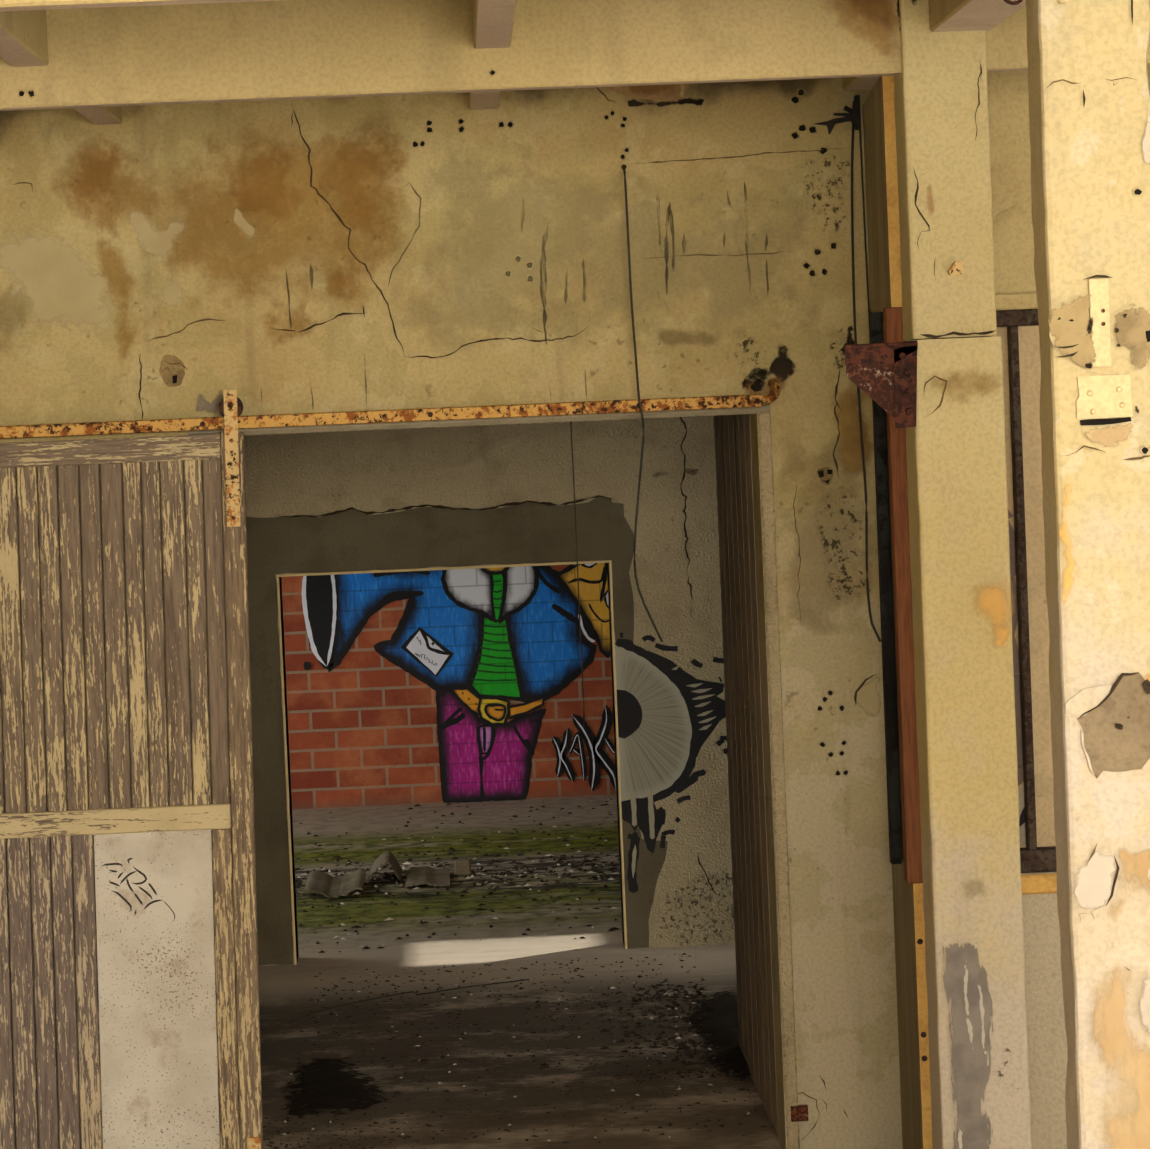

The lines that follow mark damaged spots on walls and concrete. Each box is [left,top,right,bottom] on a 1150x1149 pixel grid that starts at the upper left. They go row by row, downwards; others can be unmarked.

spalling [604,84,689,102]
crack [273,100,587,359]
spalling [1048,295,1096,369]
spalling [1115,304,1150,368]
crack [680,417,699,616]
peeling [246,497,634,966]
spalling [1065,672,1150,779]
peeling [622,820,668,949]